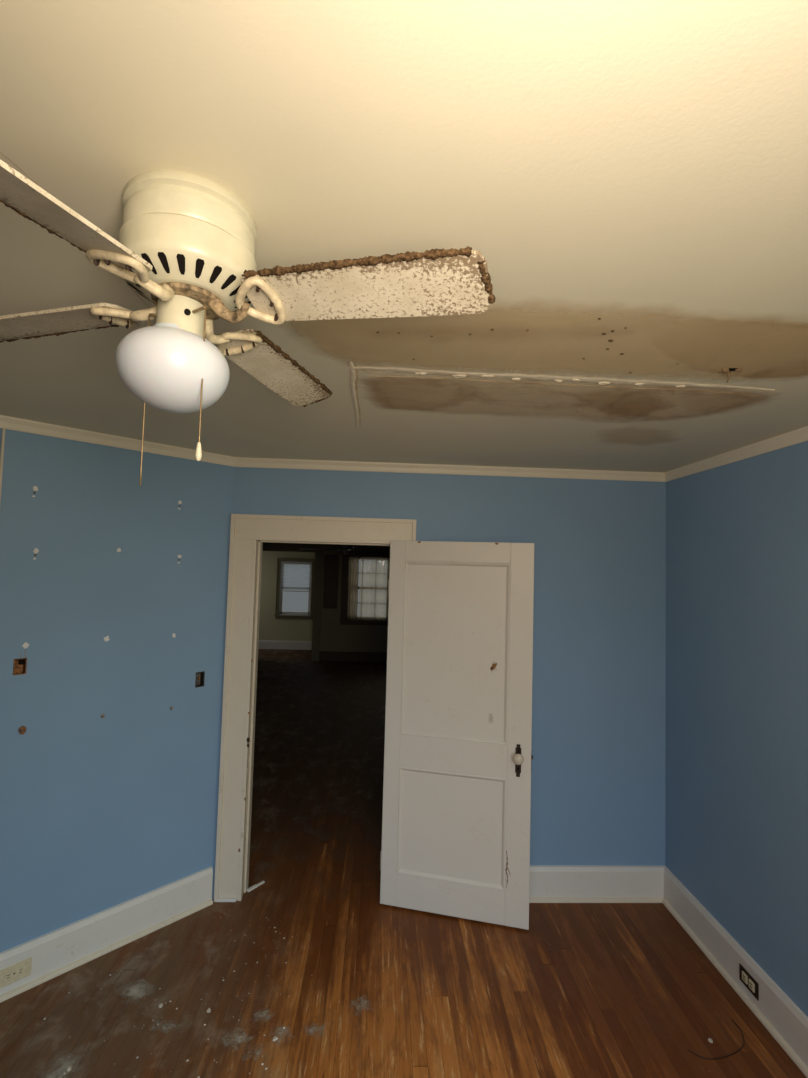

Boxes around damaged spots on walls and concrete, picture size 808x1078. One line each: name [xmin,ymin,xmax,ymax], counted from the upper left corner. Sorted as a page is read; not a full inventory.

leakage [242,246,808,407]